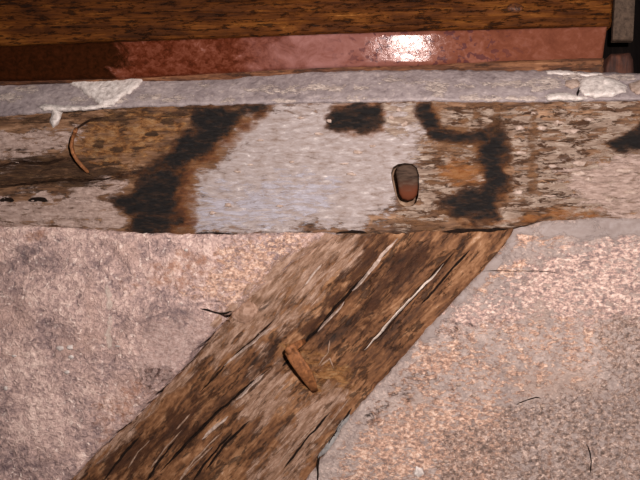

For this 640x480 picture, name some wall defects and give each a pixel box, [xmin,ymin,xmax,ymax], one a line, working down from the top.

water stain [0,113,51,123]
water stain [73,109,150,122]
corrosion [74,107,192,172]
water stain [441,102,505,133]
water stain [527,102,540,193]
water stain [186,101,486,335]
crack [362,250,470,351]
crack [148,238,398,480]
crack [104,437,150,480]
water stain [90,395,211,480]